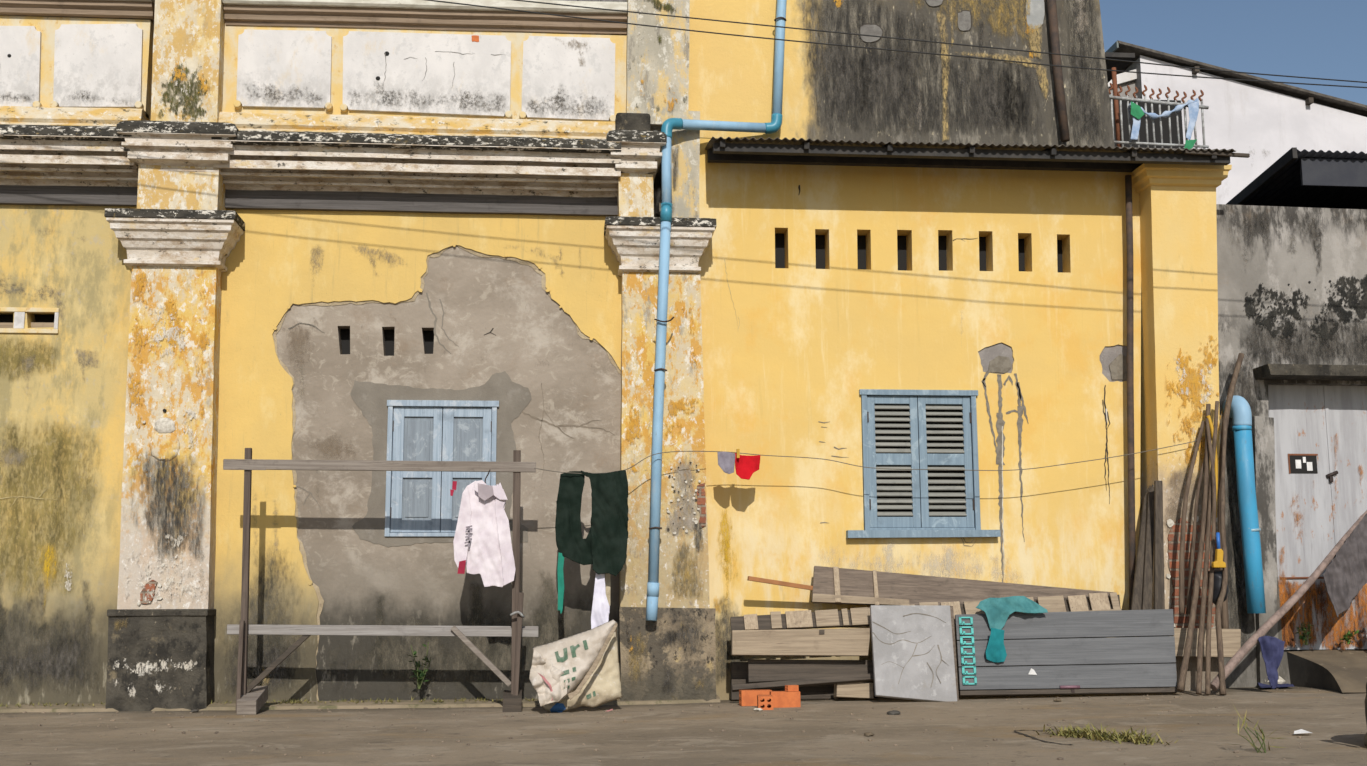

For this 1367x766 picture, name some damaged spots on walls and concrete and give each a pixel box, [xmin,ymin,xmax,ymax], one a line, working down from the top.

damp [530,97,594,114]
damp [803,0,1048,140]
peeling [128,271,209,447]
damp [1229,214,1367,416]
damp [0,525,96,686]
flaking render [137,580,162,605]
peeling [113,659,197,697]
flaking render [272,243,642,701]
flaking render [667,462,706,534]
flaking render [1166,335,1221,628]
damp [1213,426,1249,645]
corrosion [1278,548,1367,650]